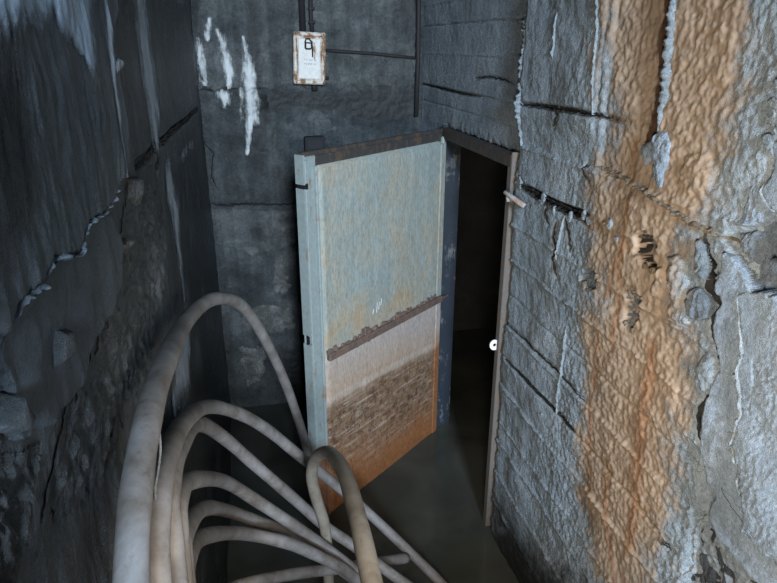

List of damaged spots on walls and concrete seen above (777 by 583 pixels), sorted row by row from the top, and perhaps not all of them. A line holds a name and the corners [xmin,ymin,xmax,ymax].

leakage [197,6,412,155]
leakage [640,131,671,189]
rust [576,0,747,583]
crack [703,233,722,366]
crack [696,395,709,440]
crack [721,487,751,538]